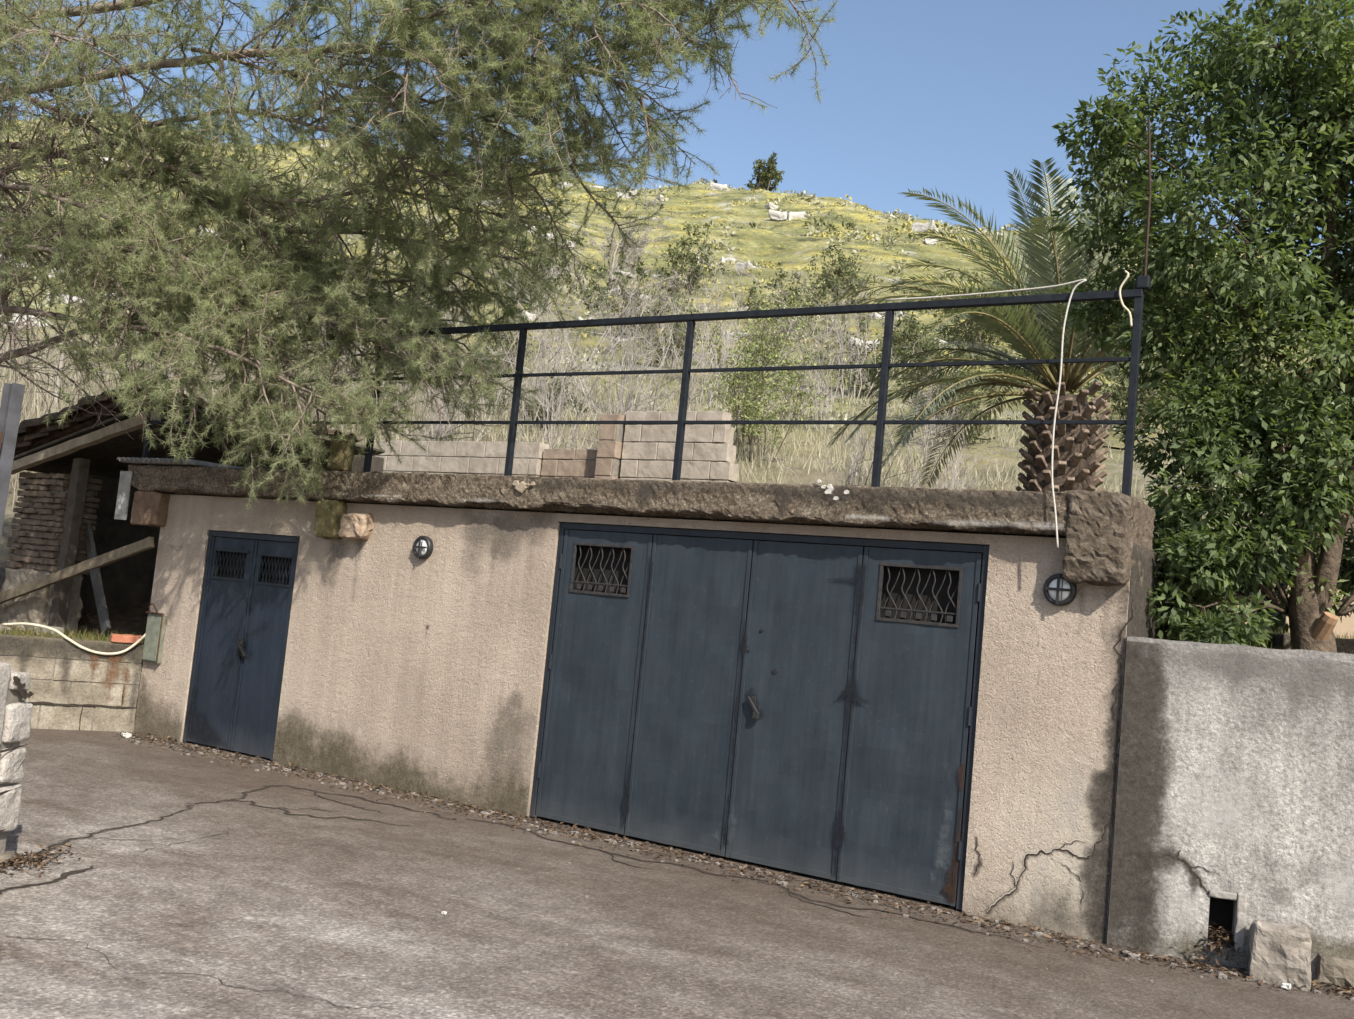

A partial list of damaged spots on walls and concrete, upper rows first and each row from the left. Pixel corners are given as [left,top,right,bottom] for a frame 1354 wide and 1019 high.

crack [0,744,28,753]
crack [974,590,1133,913]
leakage [1081,542,1179,952]
crack [279,791,380,812]
crack [1155,850,1217,894]